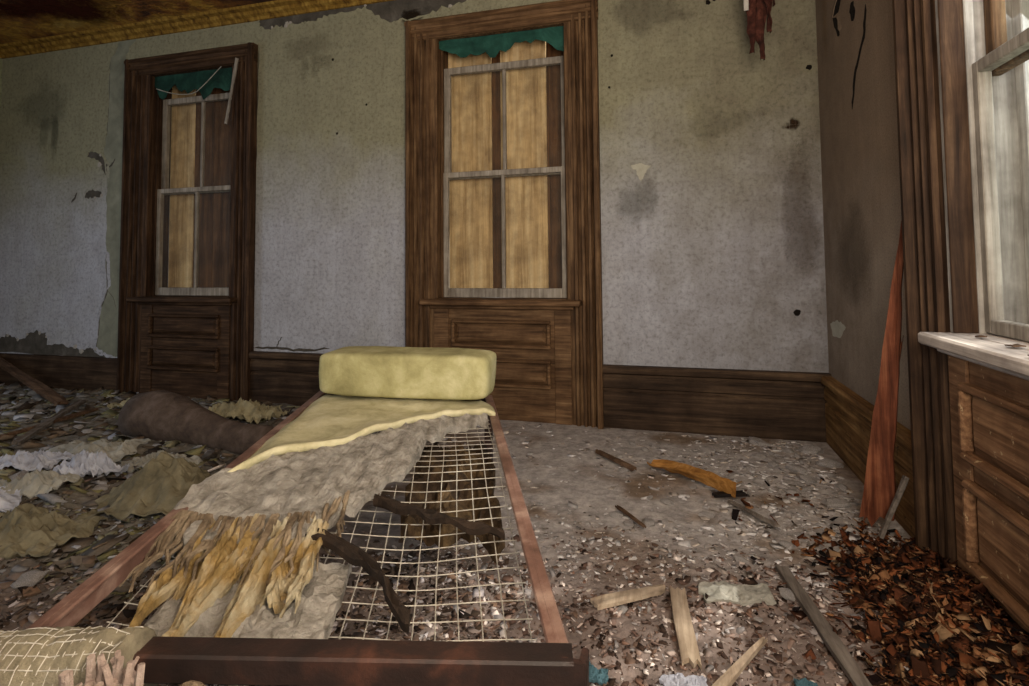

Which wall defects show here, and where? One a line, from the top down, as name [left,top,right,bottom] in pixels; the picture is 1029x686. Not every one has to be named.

spalling [257,0,476,33]
spalling [0,39,138,358]